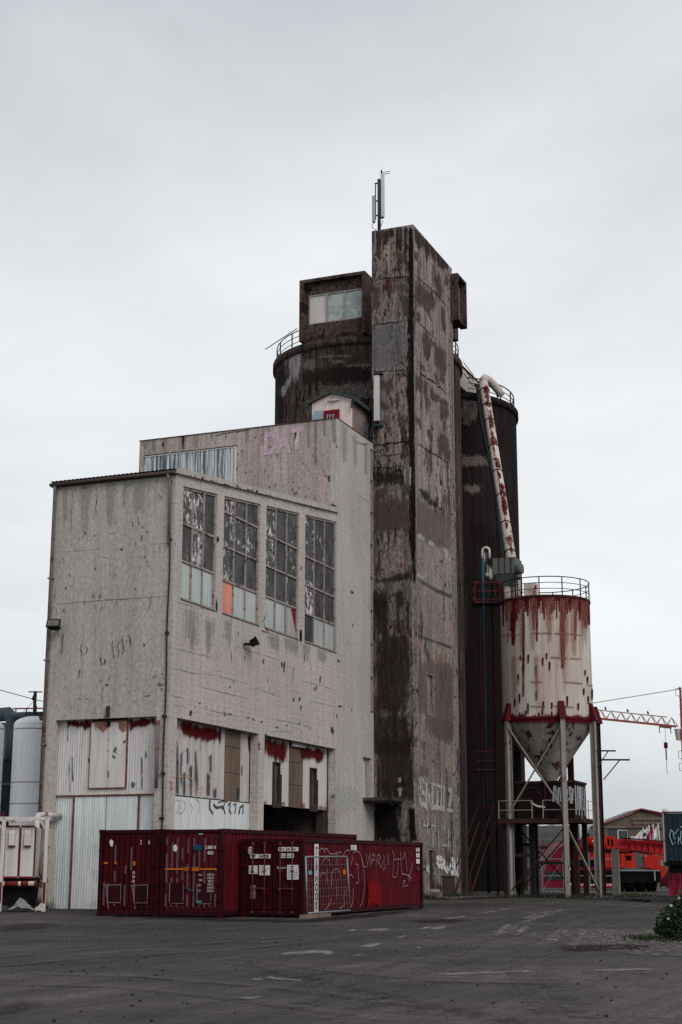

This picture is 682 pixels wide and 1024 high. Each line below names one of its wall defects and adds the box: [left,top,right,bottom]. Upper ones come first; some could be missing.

water stain [275,354,372,421]
rust [483,385,513,554]
water stain [372,227,517,891]
rust [502,597,593,724]
rust [67,718,156,732]
rust [178,721,223,743]
rust [265,737,287,763]
rust [300,746,329,763]